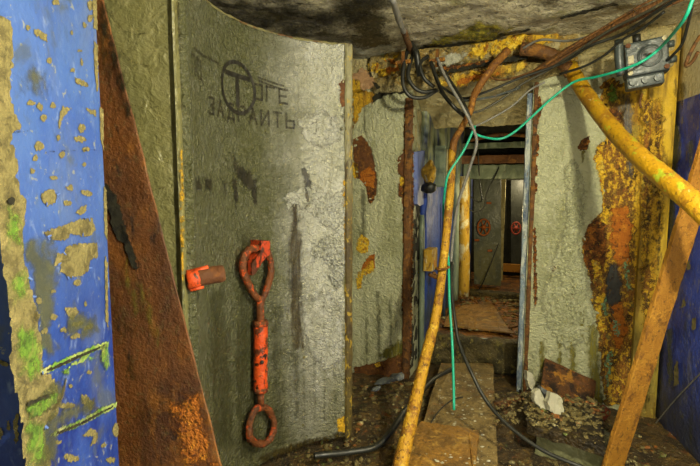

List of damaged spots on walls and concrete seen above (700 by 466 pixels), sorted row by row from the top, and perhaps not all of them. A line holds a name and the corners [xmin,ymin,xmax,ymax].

peeling [83,0,98,30]
rust [100,5,127,92]
damp [239,0,399,77]
rust [599,77,666,162]
damp [26,240,57,353]
peeling [0,16,99,466]
peeling [41,184,109,330]
damp [288,204,304,350]
rust [578,136,664,406]
damp [37,400,99,465]
peeling [83,428,107,448]
rust [168,393,219,466]